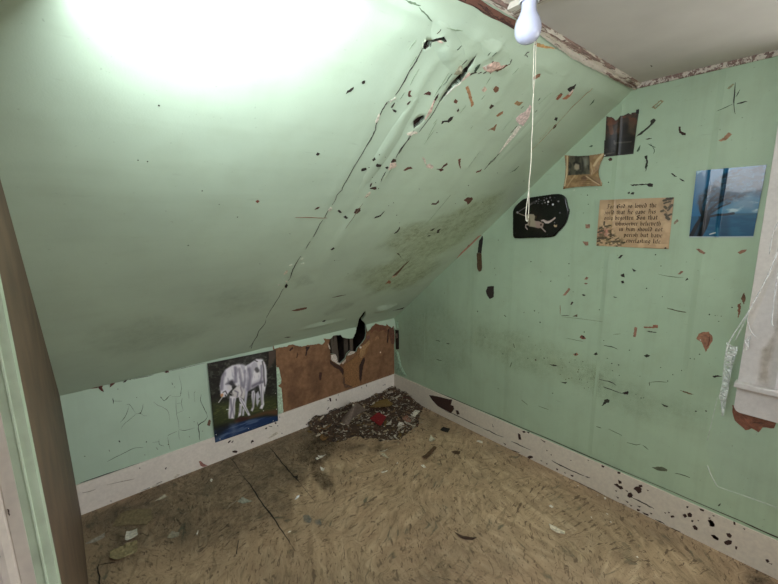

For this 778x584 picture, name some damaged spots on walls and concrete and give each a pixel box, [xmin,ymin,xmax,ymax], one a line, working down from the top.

crack [346,74,452,228]
crack [251,48,423,348]
peeling [265,311,398,438]
peeling [696,332,713,351]
crack [107,381,211,462]
peeling [732,405,776,432]
peeling [614,472,652,516]
peeling [664,506,745,550]